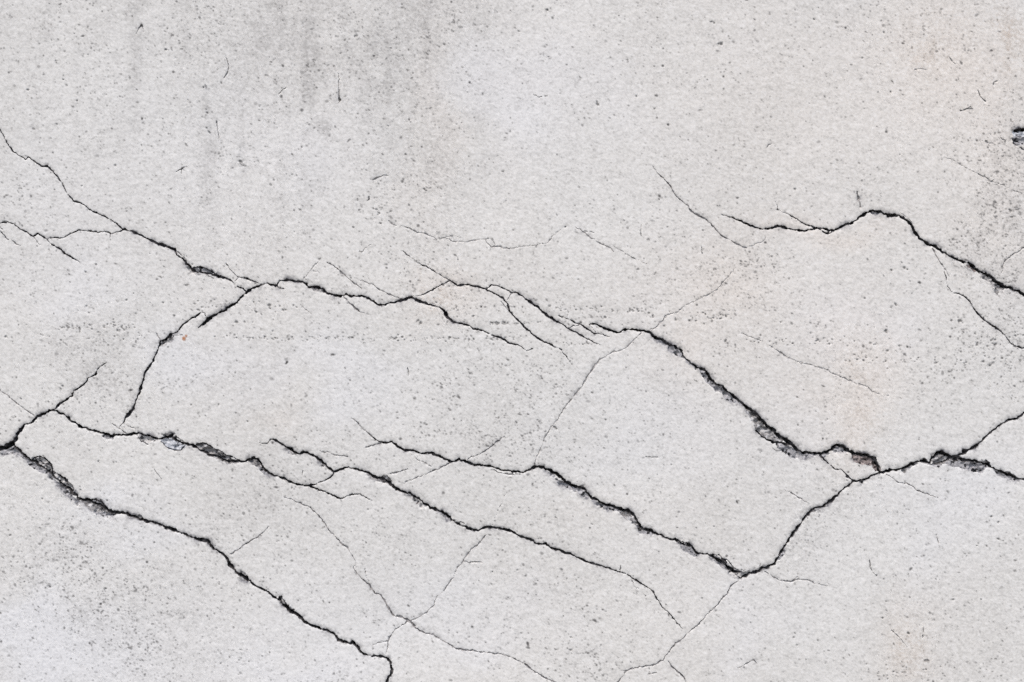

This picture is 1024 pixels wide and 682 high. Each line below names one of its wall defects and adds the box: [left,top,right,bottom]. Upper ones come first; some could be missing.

crack [0,129,235,285]
crack [388,220,643,263]
crack [653,167,1024,349]
crack [944,157,1021,193]
crack [0,262,1024,682]